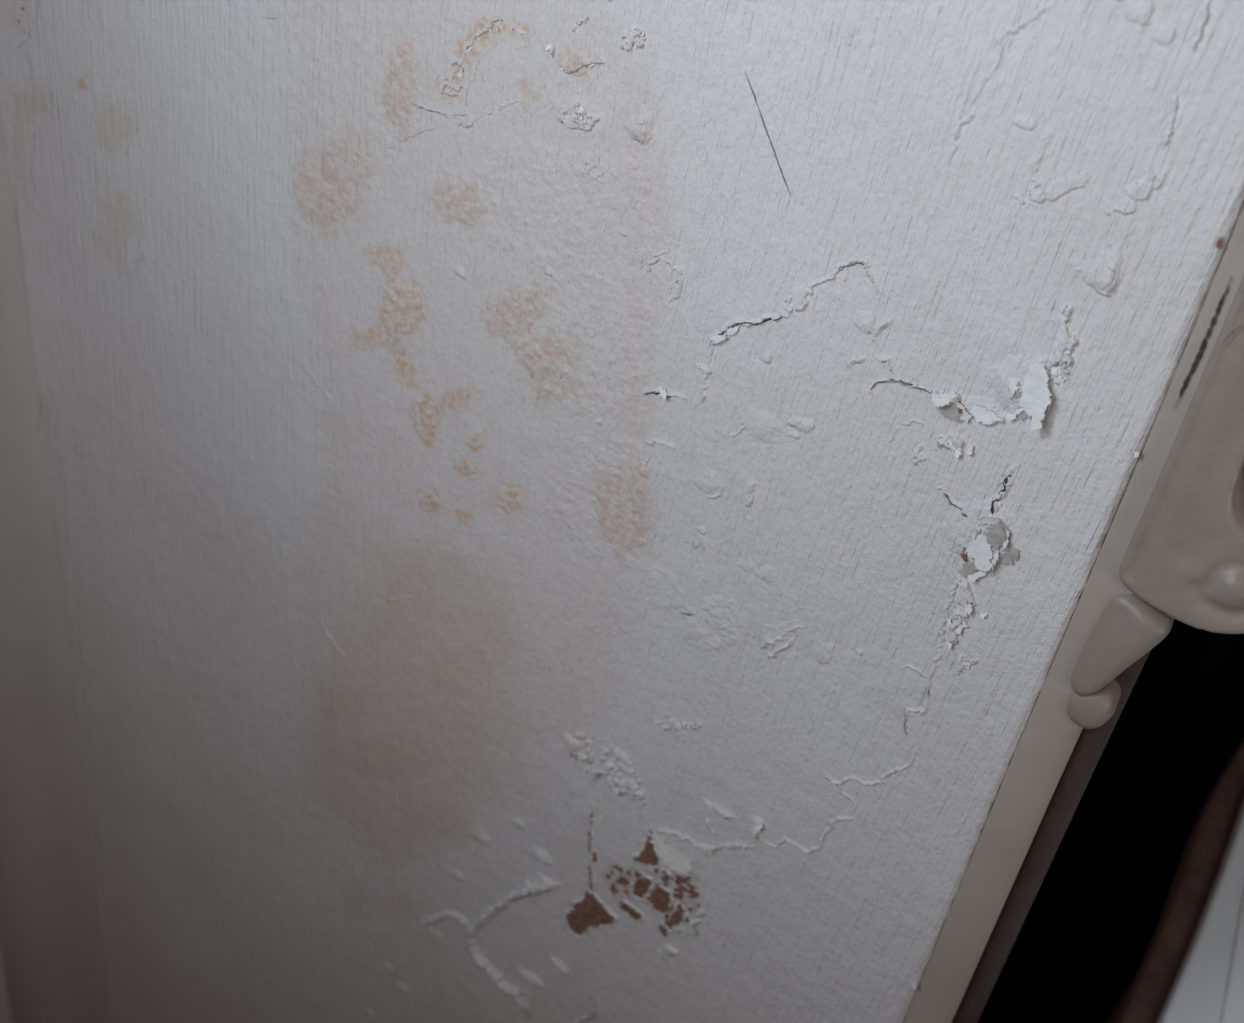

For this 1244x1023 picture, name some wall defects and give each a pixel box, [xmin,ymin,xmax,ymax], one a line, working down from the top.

peeling [429,10,536,106]
peeling [554,102,600,130]
peeling [619,28,647,51]
crack [694,256,872,406]
crack [869,378,932,395]
peeling [931,305,1079,458]
damp [258,0,728,931]
crack [935,463,1017,518]
peeling [940,498,1019,649]
crack [759,568,963,854]
peeling [417,871,564,1017]
flaking render [562,815,764,958]